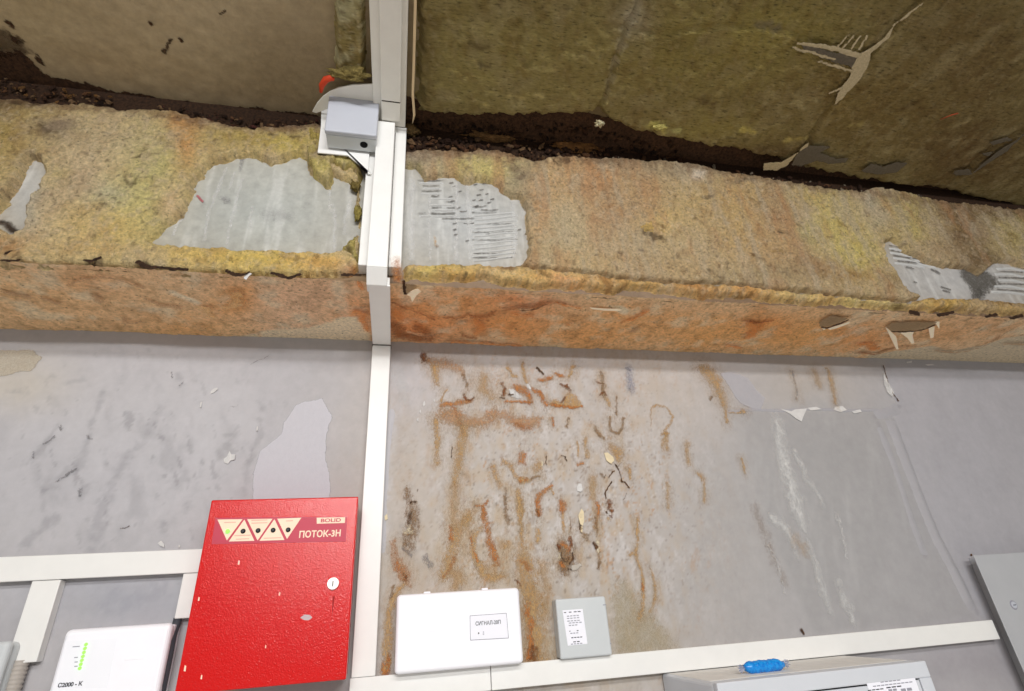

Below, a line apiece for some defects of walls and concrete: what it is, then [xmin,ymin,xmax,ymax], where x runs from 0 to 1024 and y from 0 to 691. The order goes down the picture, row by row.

spalling [820,316,850,330]
spalling [886,321,940,349]
rust [391,302,583,486]
rust [577,371,631,479]
water stain [775,418,805,529]
rust [381,540,410,675]
rust [441,452,614,662]
rust [629,518,656,620]